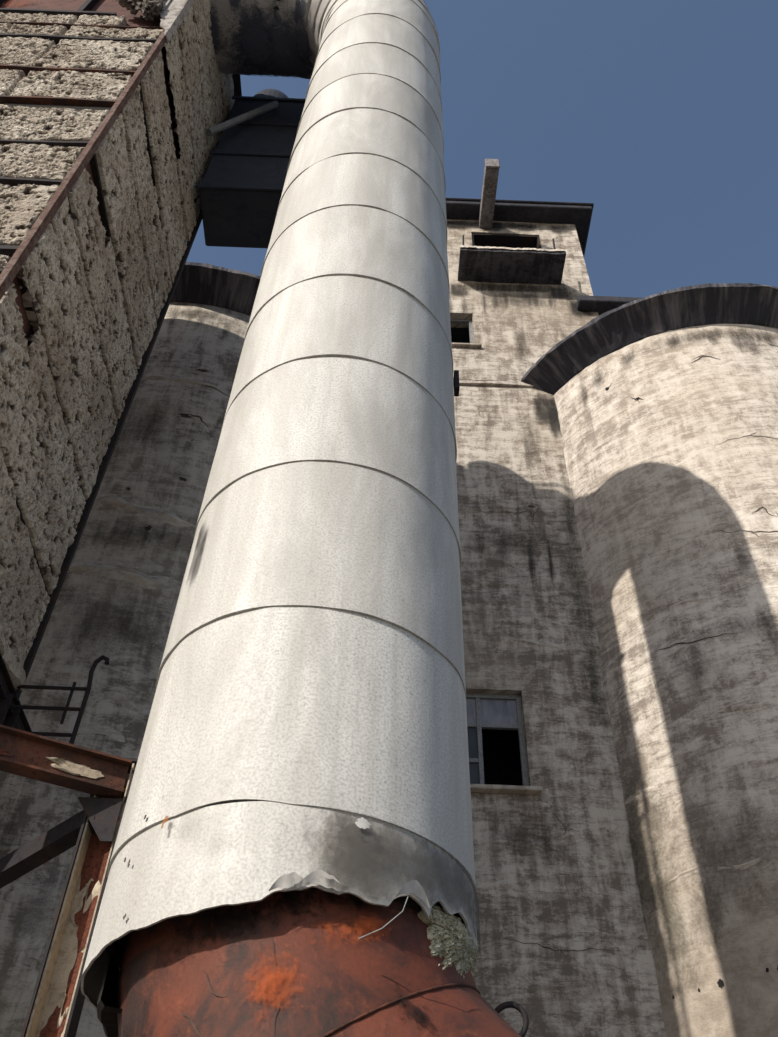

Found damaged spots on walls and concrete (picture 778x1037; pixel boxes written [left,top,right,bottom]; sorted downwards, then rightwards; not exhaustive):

leakage [210,7,222,53]
leakage [294,0,312,66]
leakage [548,404,561,435]
crack [707,506,778,537]
crack [657,633,736,651]
peeling [46,757,104,779]
peeling [39,834,112,1037]